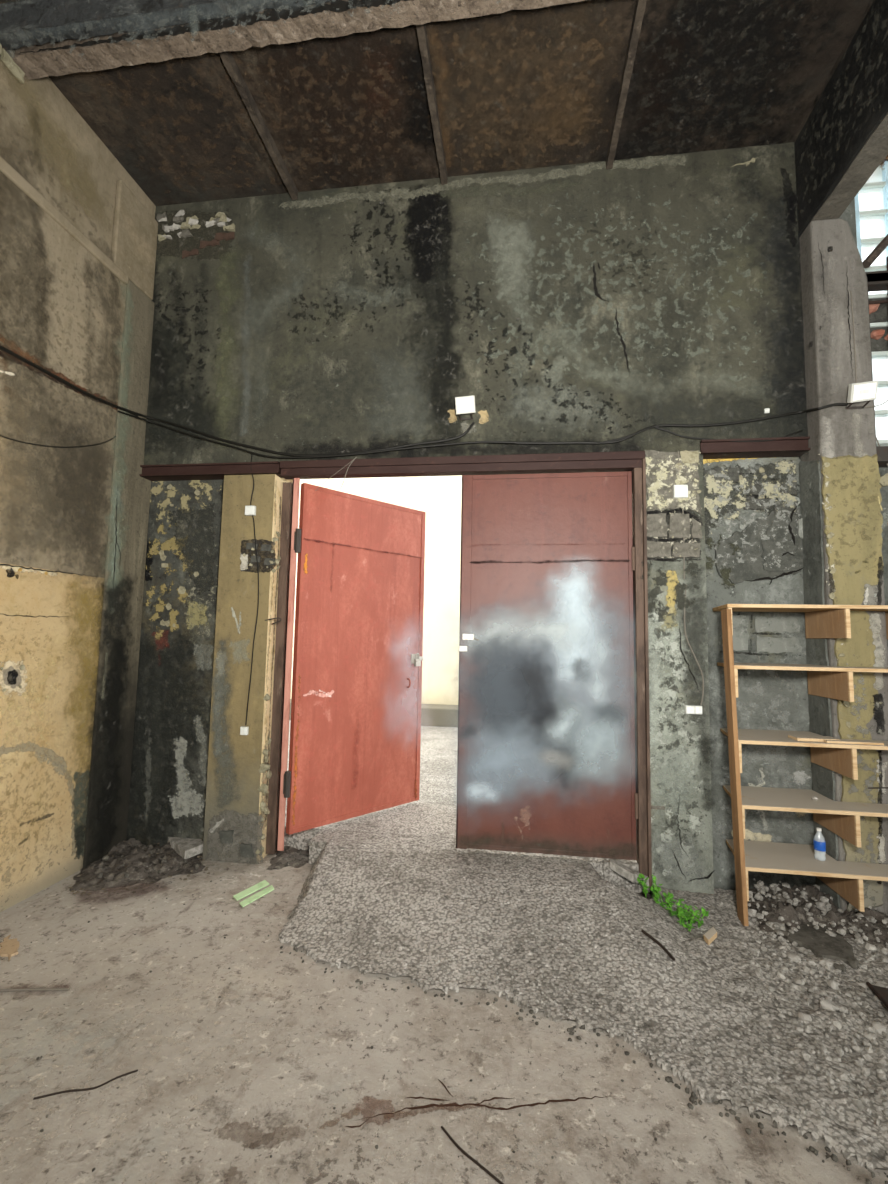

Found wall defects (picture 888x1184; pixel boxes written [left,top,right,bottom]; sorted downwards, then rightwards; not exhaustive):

flaking render [155,209,236,261]
damp [145,0,888,460]
crack [593,263,630,374]
damp [0,134,236,859]
peeling [145,480,222,639]
flaking render [641,450,803,616]
crack [753,506,803,585]
flaking render [819,454,836,600]
crack [679,621,699,690]
crack [672,791,715,882]